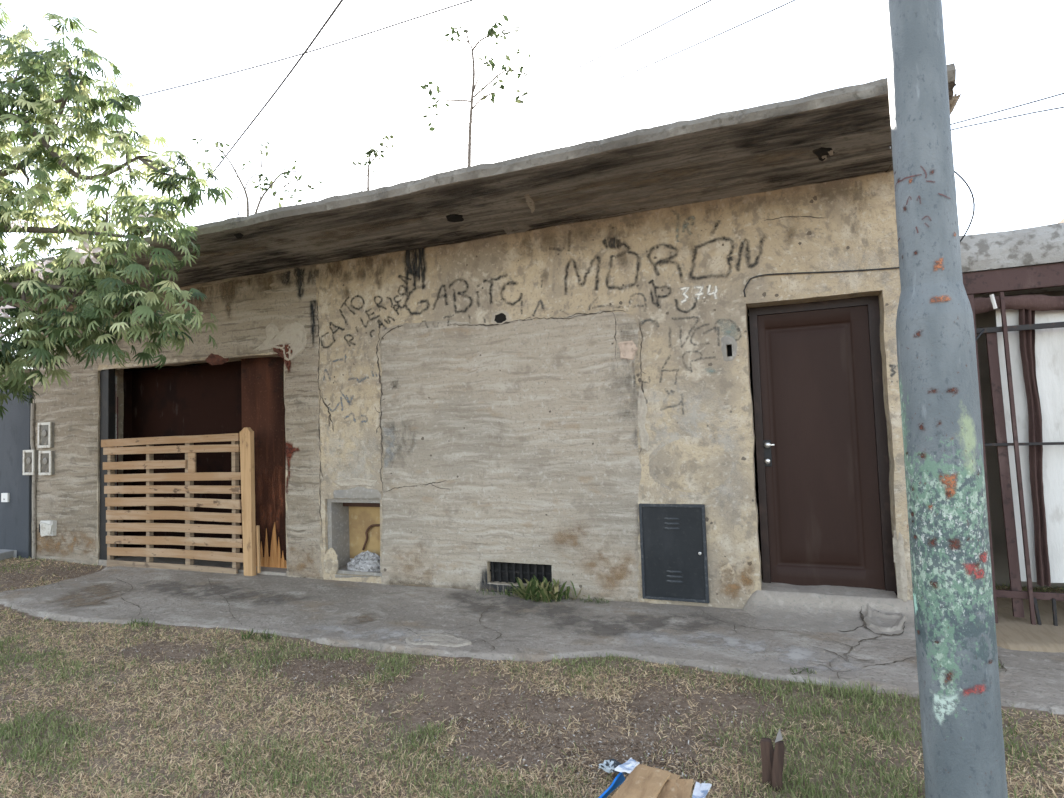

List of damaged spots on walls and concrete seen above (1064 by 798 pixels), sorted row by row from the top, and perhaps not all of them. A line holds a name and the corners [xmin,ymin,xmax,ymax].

damp [738,85,890,163]
damp [769,152,892,188]
damp [603,237,620,248]
damp [154,187,513,341]
crack [375,325,450,492]
rust [285,443,299,494]
peeling [939,475,956,497]
peeling [964,552,987,578]
crack [841,606,905,636]
peeling [934,685,985,724]